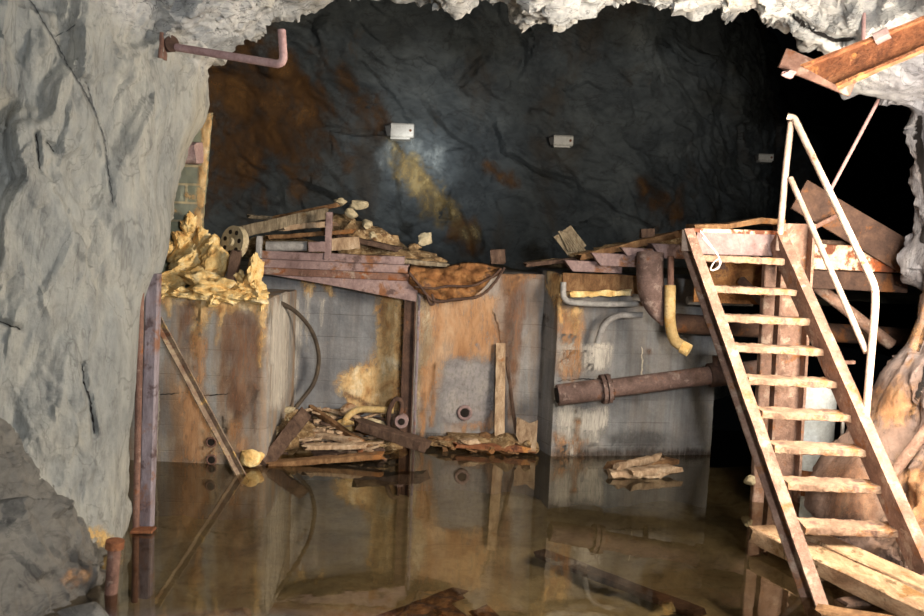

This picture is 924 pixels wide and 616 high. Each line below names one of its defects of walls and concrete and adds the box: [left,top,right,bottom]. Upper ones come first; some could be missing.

corrosion [161,38,334,463]
corrosion [417,268,584,434]